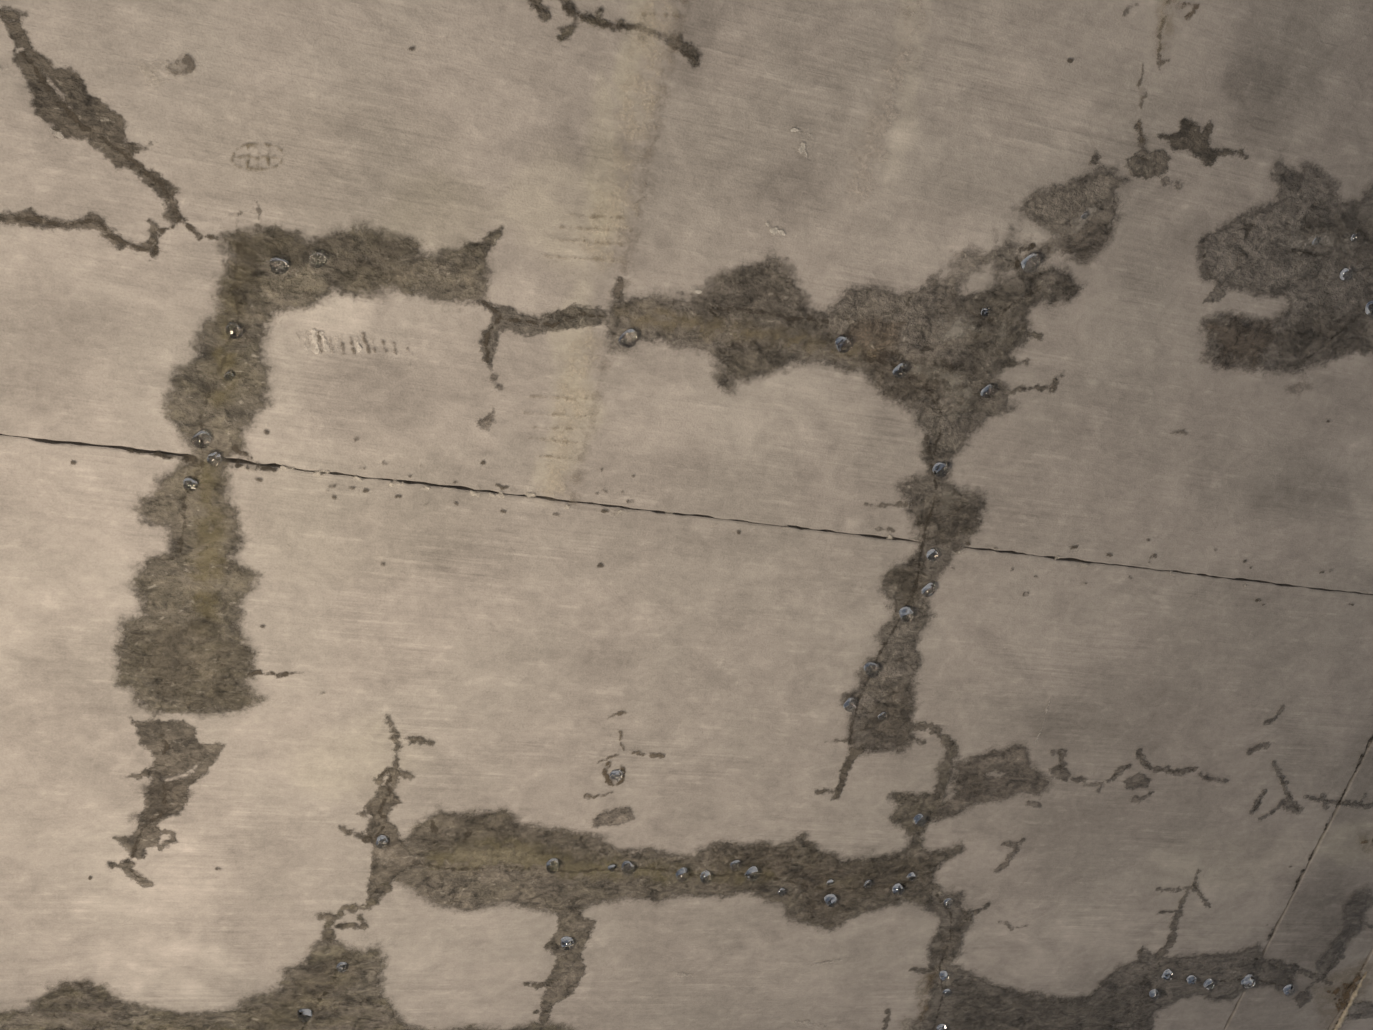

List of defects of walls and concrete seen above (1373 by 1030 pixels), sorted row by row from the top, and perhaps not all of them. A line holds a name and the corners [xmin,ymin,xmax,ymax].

crack [0,7,218,258]
crack [528,0,701,67]
damp [107,208,503,888]
damp [393,118,1373,1030]
crack [1049,706,1373,820]
damp [0,882,422,1030]